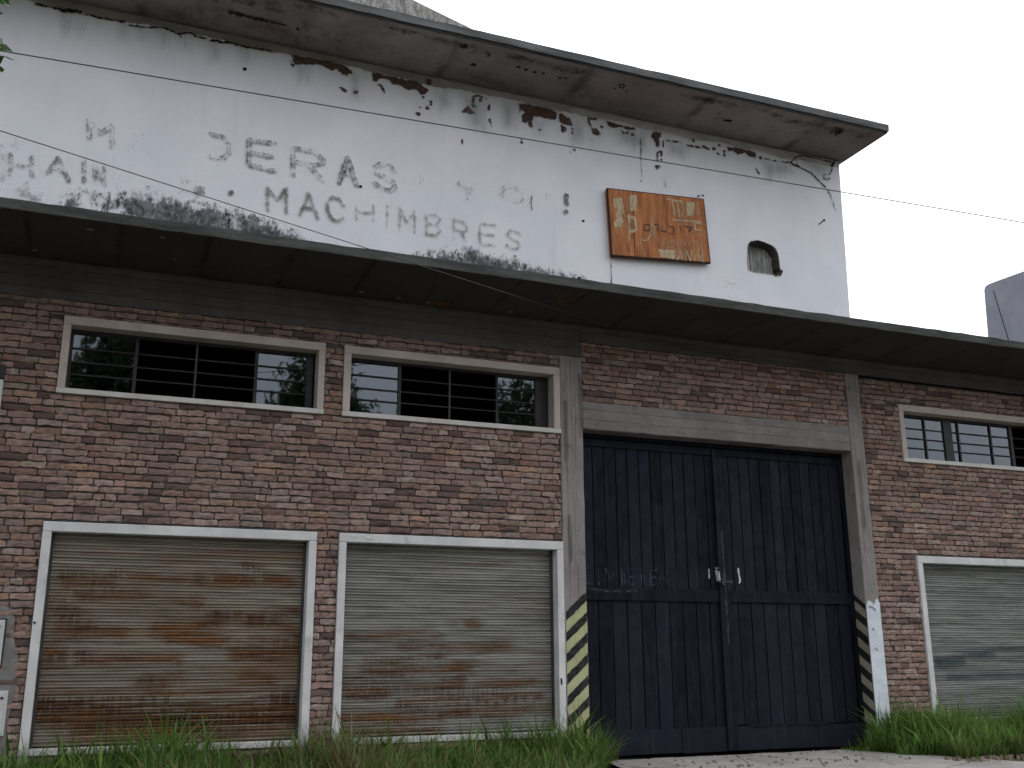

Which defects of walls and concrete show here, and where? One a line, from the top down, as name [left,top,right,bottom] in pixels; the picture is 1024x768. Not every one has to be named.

peeling [290,55,358,94]
peeling [371,72,433,116]
peeling [462,94,492,126]
peeling [518,103,573,134]
peeling [587,117,635,136]
crack [764,129,844,208]
water stain [65,190,299,239]
water stain [412,246,583,279]
corrosion [35,601,300,741]
corrosion [340,645,542,735]